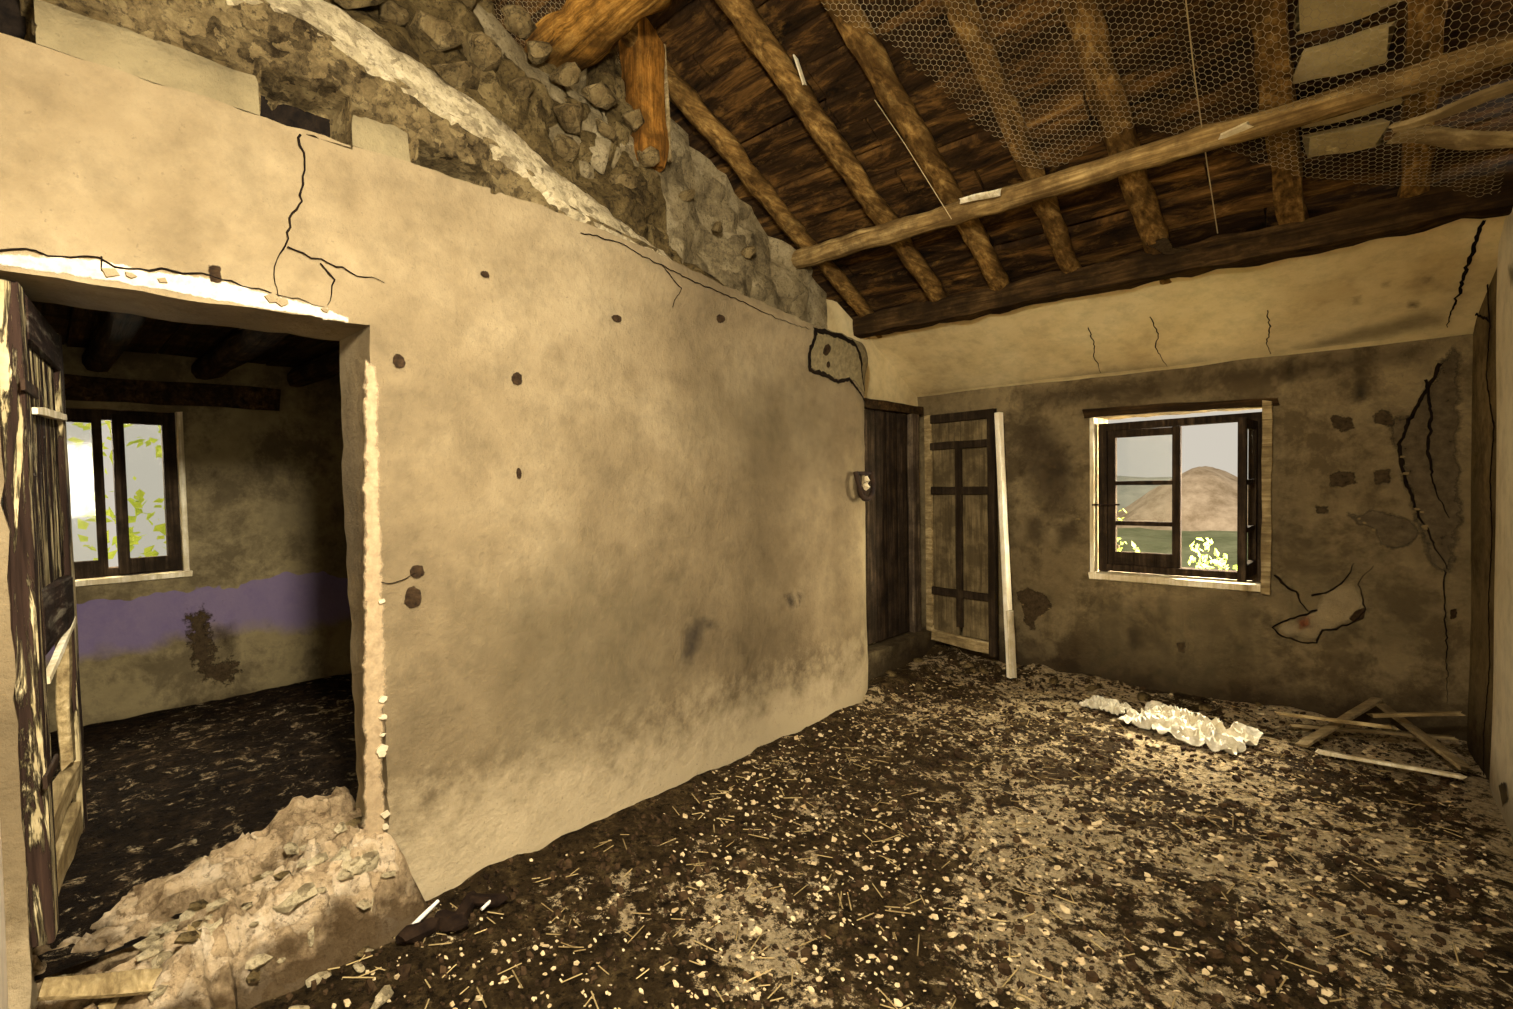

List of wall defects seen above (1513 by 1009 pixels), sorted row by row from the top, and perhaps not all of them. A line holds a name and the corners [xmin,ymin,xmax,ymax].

crack [0,134,384,307]
peeling [1330,347,1464,571]
crack [1446,220,1495,775]
spalling [1349,608,1365,623]